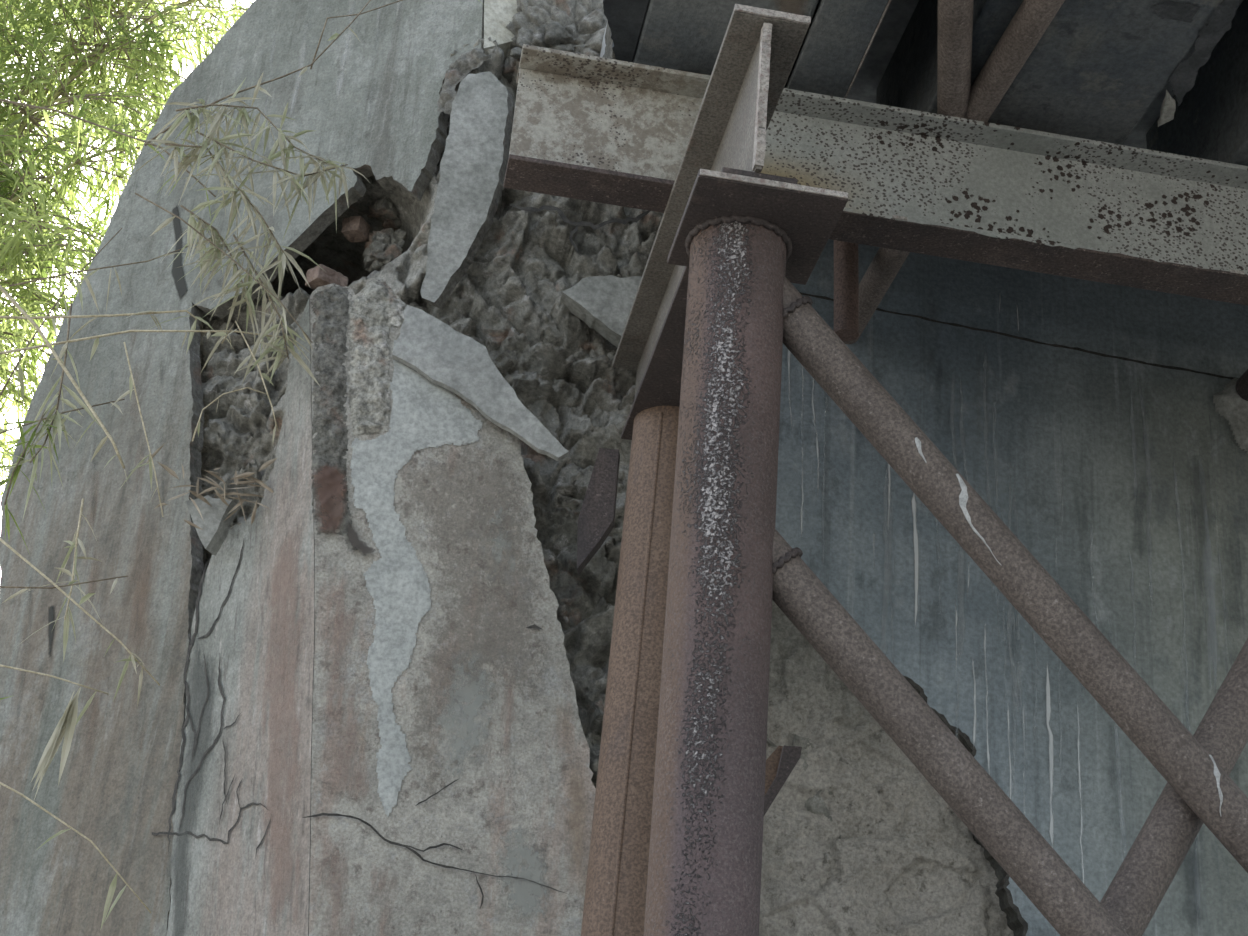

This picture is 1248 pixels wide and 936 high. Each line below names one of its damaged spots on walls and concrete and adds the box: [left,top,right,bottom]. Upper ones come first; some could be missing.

spalling [437,48,492,114]
spalling [603,22,616,60]
crack [799,292,834,301]
crack [876,308,1235,380]
peeling [310,278,483,817]
crack [152,539,272,859]
water stain [972,630,990,771]
crack [416,778,460,806]
spalling [759,600,1028,936]
water stain [1046,665,1054,845]
crack [302,813,567,908]